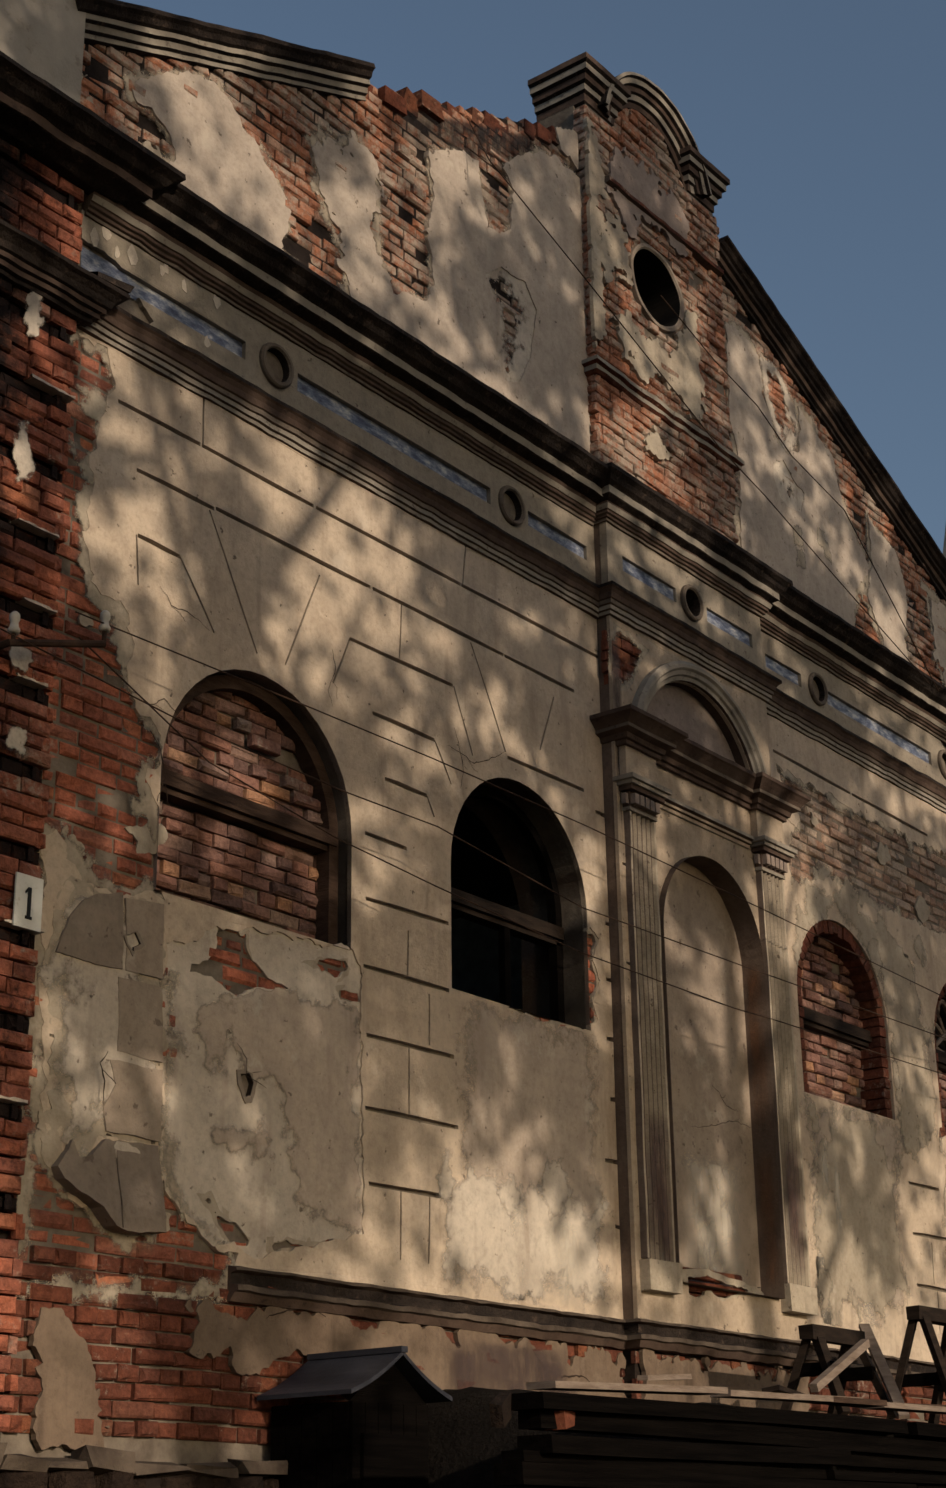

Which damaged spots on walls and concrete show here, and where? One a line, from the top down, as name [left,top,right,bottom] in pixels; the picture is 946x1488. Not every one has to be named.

spalling [38,333,168,900]
spalling [80,44,577,301]
peeling [486,267,536,382]
spalling [721,280,946,686]
peeling [4,927,363,1306]